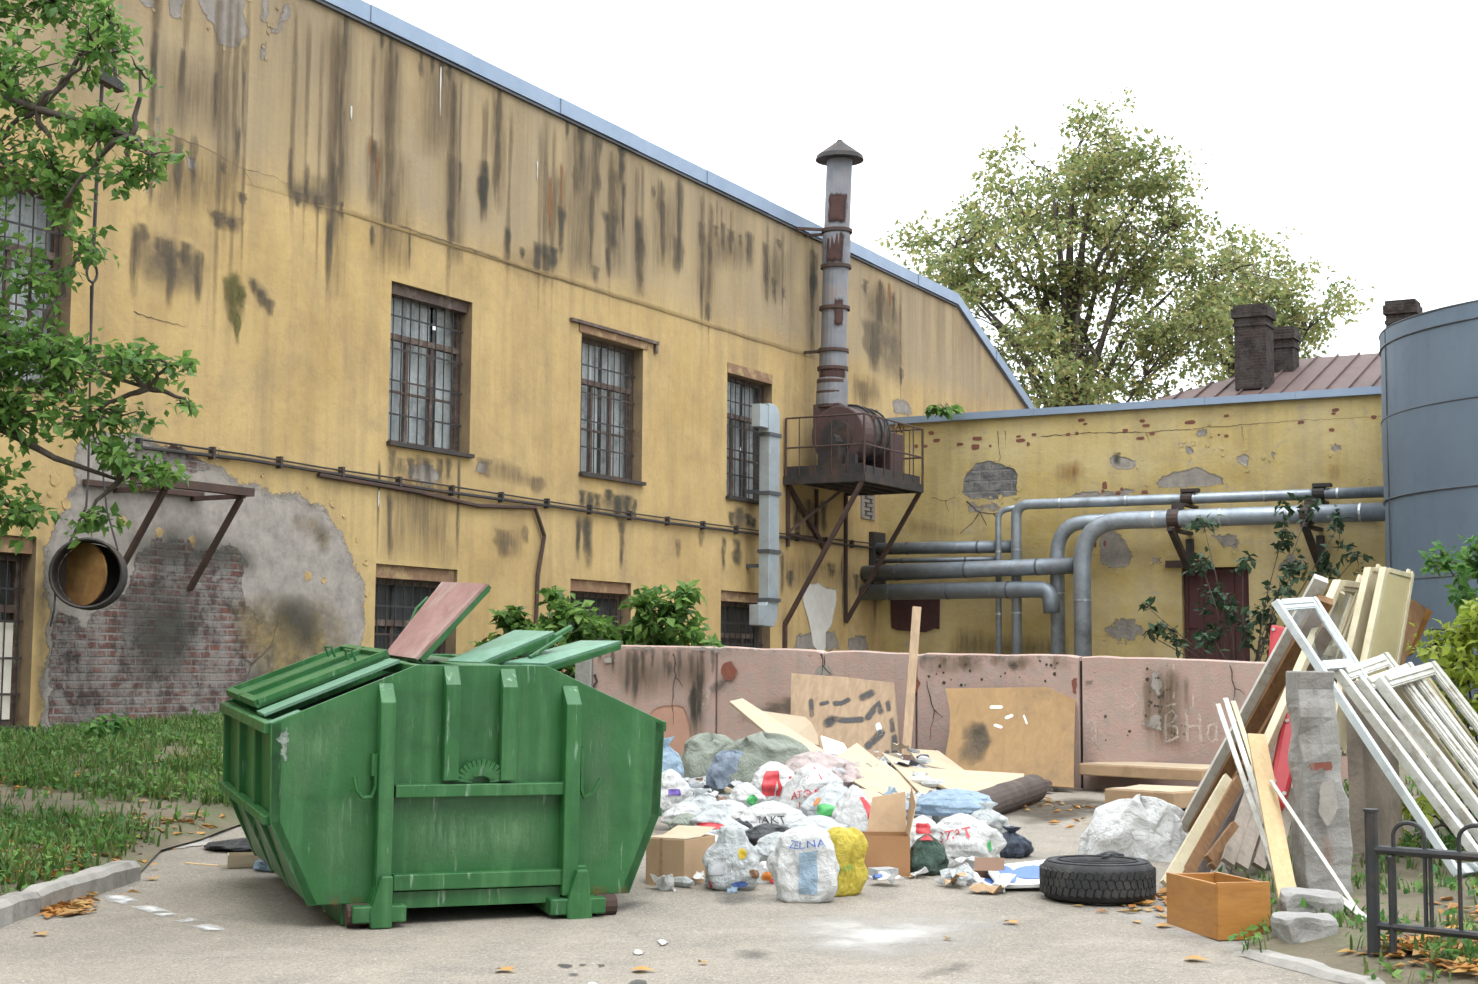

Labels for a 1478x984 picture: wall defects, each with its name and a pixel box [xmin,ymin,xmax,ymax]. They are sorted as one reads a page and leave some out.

flaking render [141,0,291,61]
damp [150,0,247,226]
damp [289,16,352,271]
damp [419,53,462,241]
damp [479,91,644,279]
rust [825,192,847,263]
damp [225,276,271,339]
rust [834,298,844,325]
rust [820,368,845,378]
flaking render [1066,414,1229,498]
flaking render [38,414,370,732]
damp [599,650,714,729]